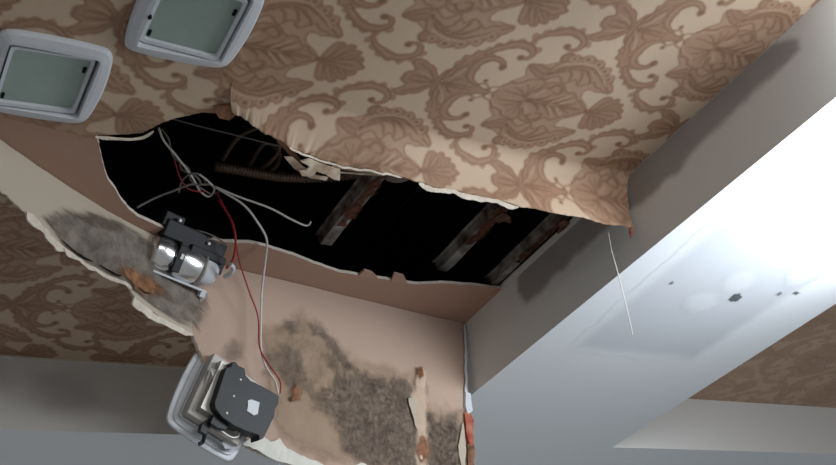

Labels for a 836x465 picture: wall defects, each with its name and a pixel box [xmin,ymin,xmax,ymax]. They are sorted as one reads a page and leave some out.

peeling [213,103,236,121]
rust [343,175,388,219]
peeling [0,139,193,336]
rust [470,203,513,241]
rust [512,215,570,272]
leakage [46,210,206,329]
peeling [357,268,378,279]
peeling [391,272,407,283]
leakage [264,318,464,465]
rust [463,392,475,465]
peeling [243,437,323,465]